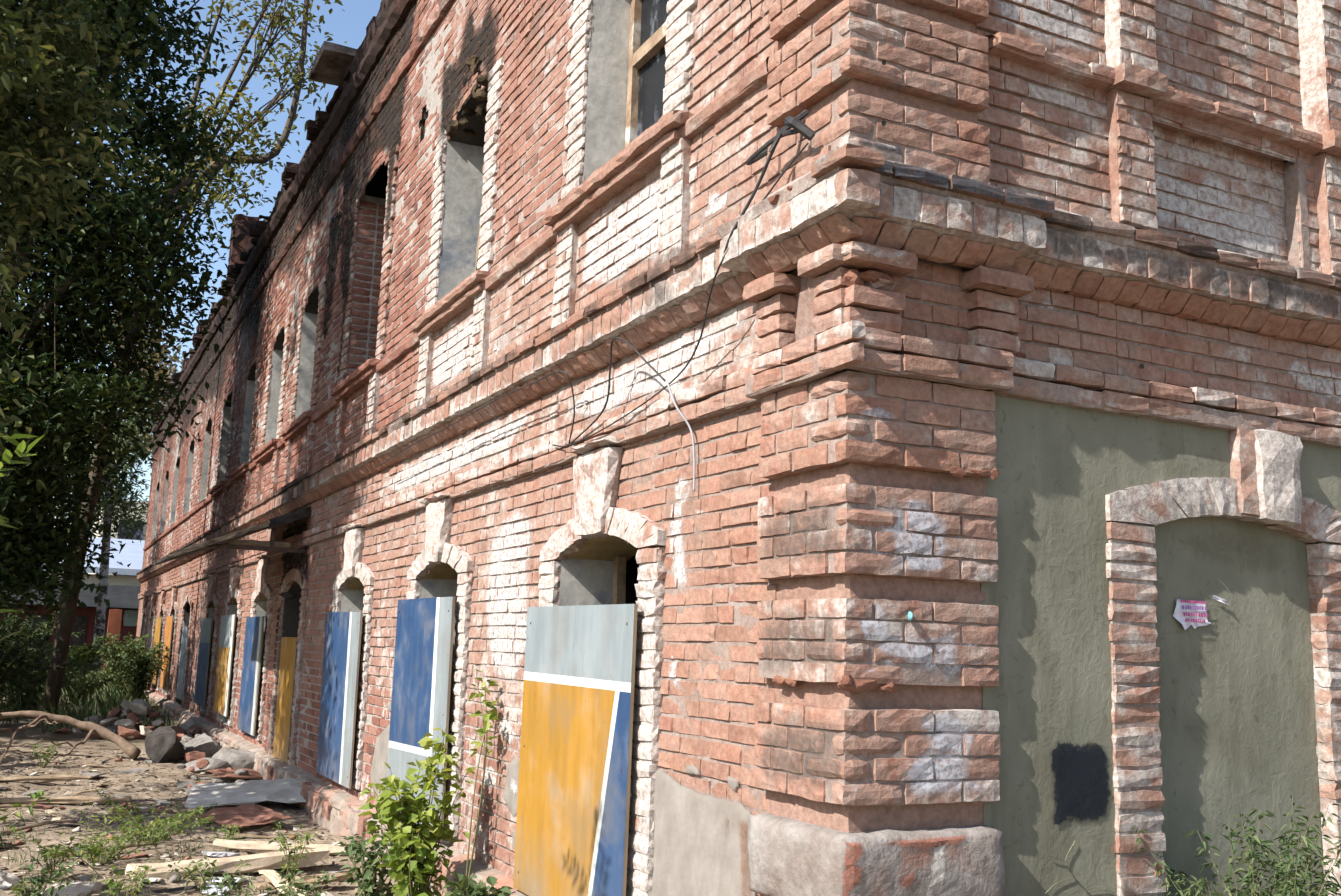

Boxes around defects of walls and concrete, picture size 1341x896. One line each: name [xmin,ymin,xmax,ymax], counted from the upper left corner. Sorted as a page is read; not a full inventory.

damp [385,126,401,239]
damp [323,212,350,372]
spalling [842,842,863,896]
spalling [888,835,965,849]